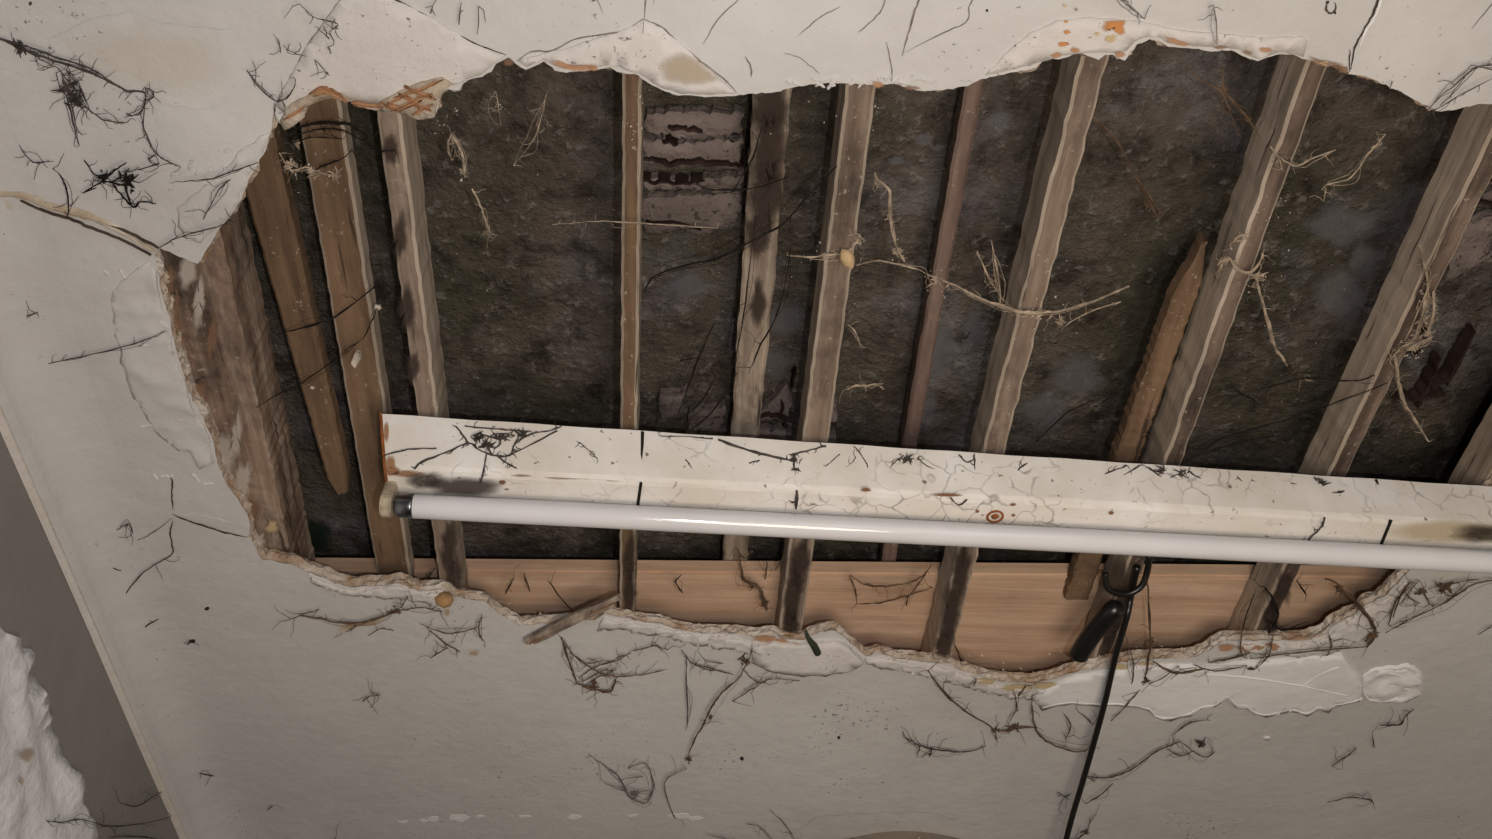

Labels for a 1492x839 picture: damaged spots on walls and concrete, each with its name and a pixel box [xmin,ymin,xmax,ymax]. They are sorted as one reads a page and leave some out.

corrosion [1052,4,1079,58]
corrosion [1095,21,1125,57]
peeling [985,17,1308,75]
peeling [275,0,745,236]
flaking render [1443,178,1492,283]
flaking render [351,350,362,368]
flaking render [1391,323,1476,409]
flaking render [657,384,727,436]
flaking render [759,365,796,441]
flaking render [827,397,839,443]
spalling [309,573,443,607]
peeling [597,580,1413,722]